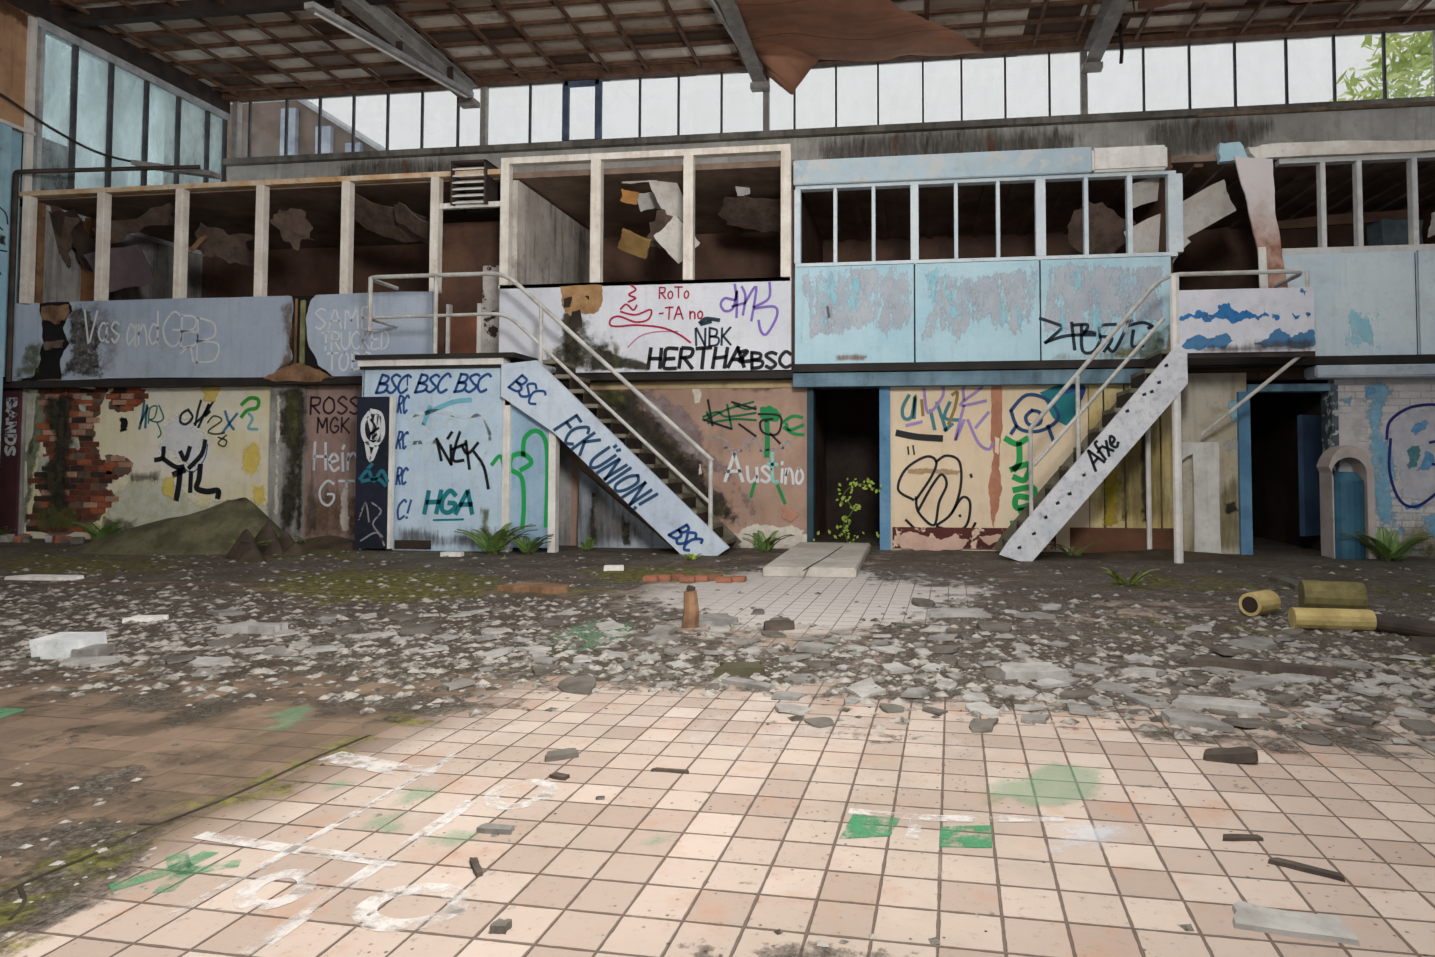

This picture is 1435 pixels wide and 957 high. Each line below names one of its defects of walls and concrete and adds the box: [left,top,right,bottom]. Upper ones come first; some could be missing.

peeling [802,262,1163,342]
peeling [1179,303,1316,351]
peeling [1346,309,1373,347]
flaking render [24,388,149,535]